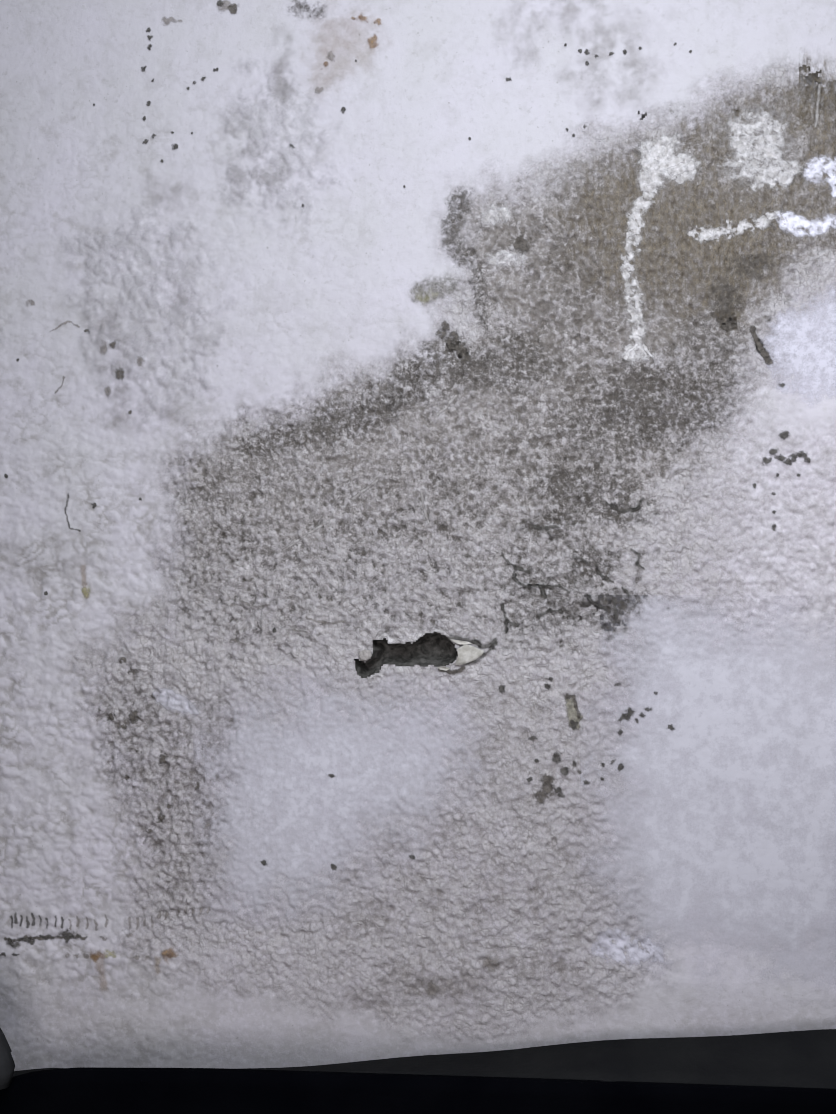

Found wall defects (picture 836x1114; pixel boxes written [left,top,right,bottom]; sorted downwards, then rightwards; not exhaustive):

mould [193,86,836,543]
peeling [74,67,836,1033]
mould [509,547,619,630]
mould [99,657,210,846]
mould [527,753,624,803]
mould [618,708,652,735]
crack [0,913,153,960]